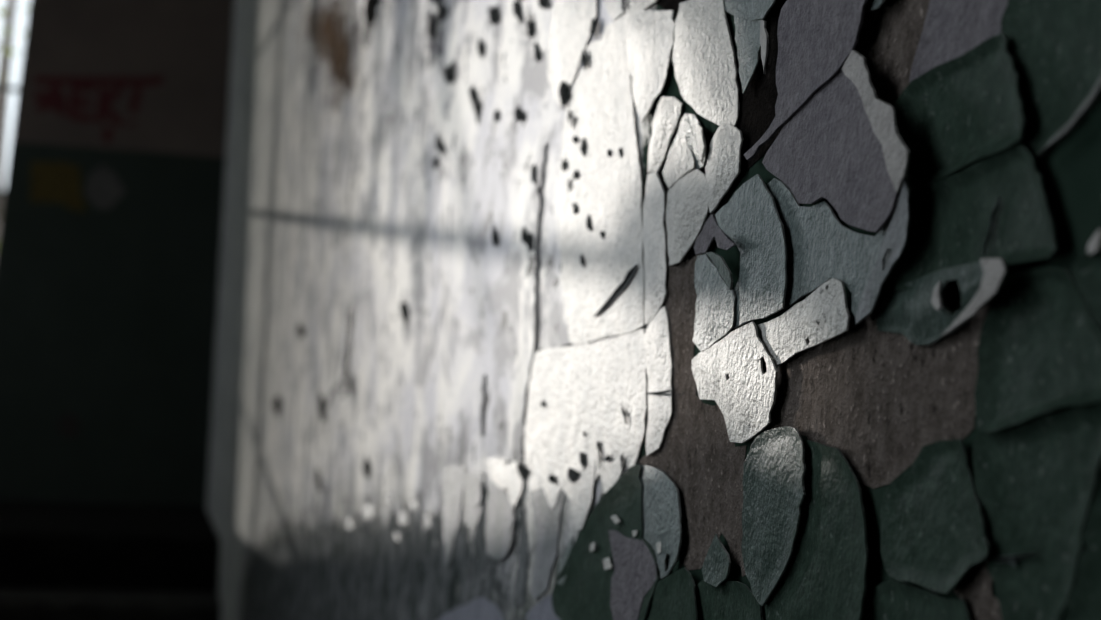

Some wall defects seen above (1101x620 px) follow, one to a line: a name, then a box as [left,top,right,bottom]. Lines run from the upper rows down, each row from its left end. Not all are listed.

peeling [347,0,1101,620]